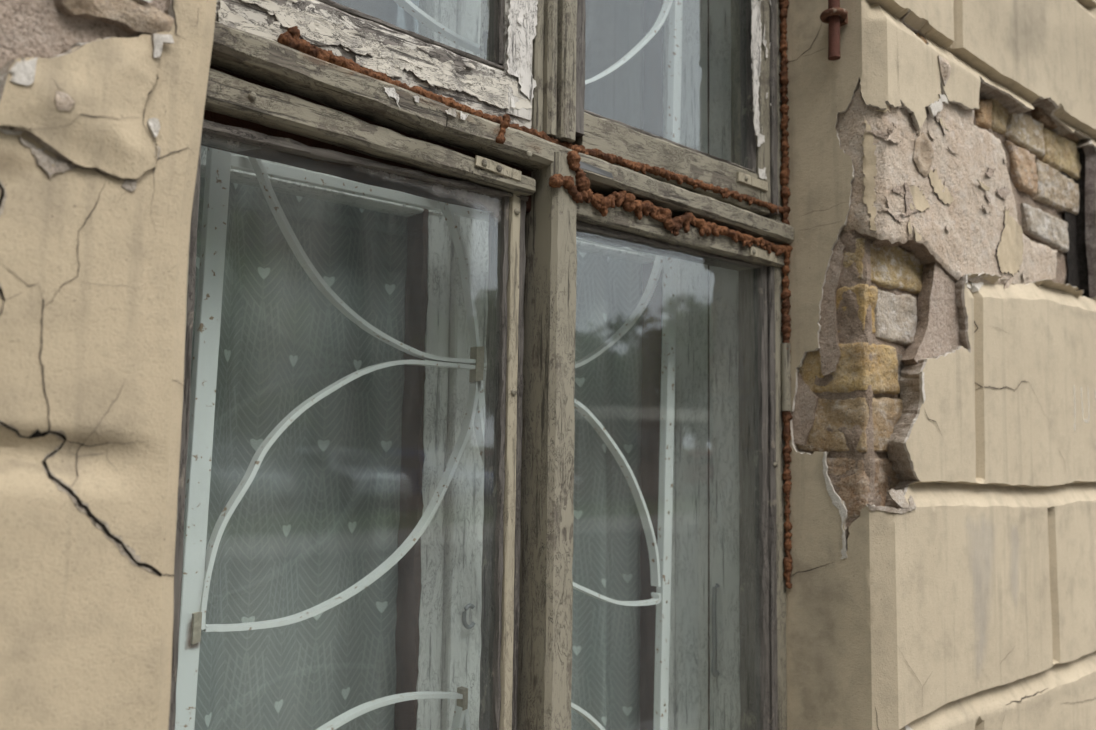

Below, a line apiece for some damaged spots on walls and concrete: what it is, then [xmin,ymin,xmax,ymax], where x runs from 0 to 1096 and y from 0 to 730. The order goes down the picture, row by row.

flaking render [0,0,174,86]
crack [172,0,199,38]
spalling [147,118,160,138]
flaking render [0,129,77,178]
flaking render [121,180,137,192]
crack [0,56,195,576]
flaking render [792,55,1096,559]
crack [974,377,1047,417]